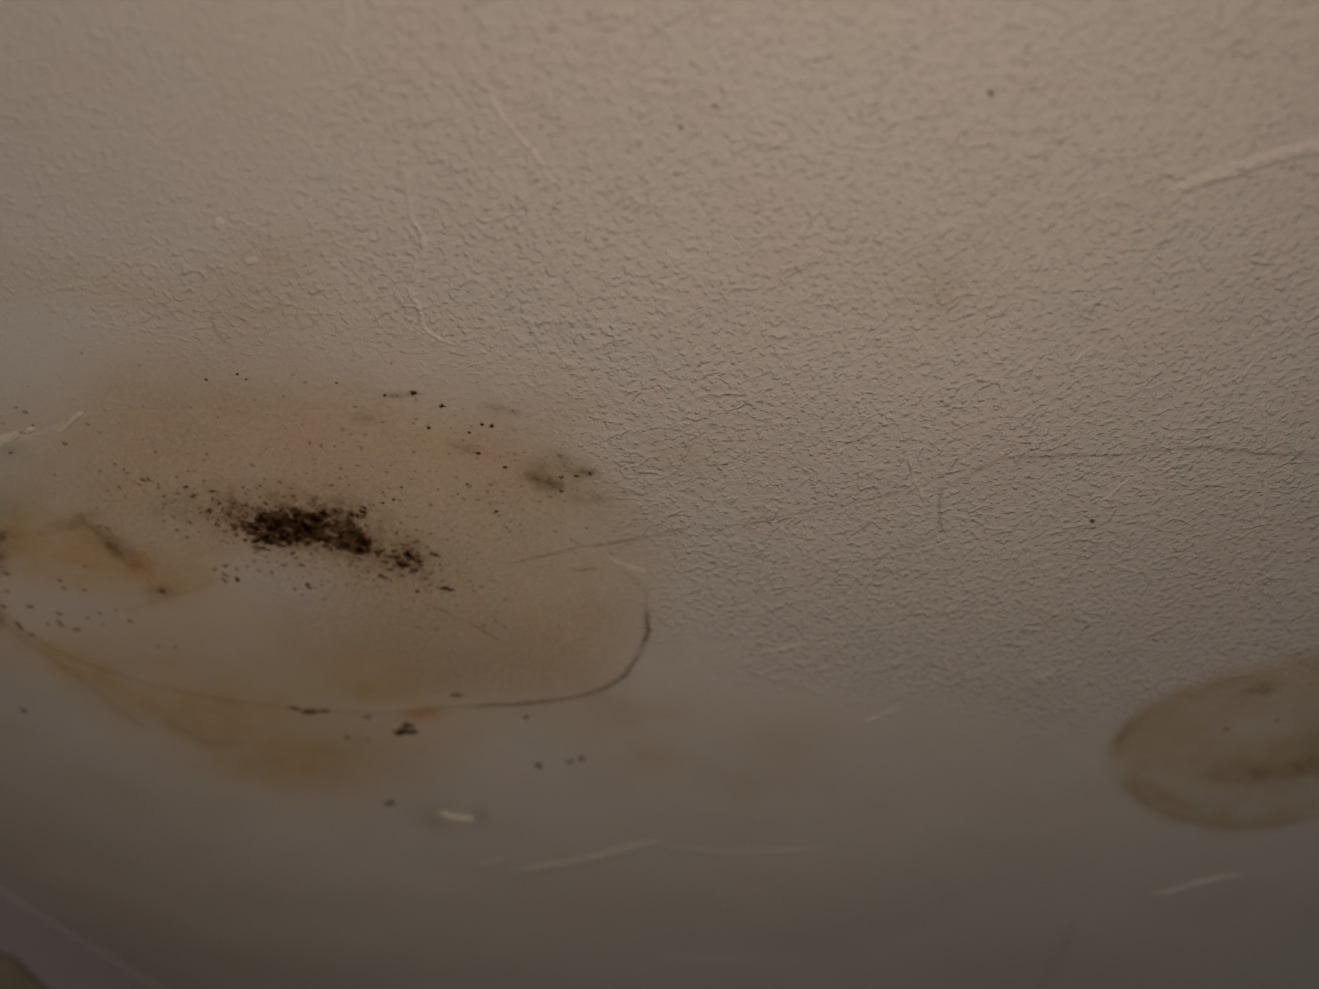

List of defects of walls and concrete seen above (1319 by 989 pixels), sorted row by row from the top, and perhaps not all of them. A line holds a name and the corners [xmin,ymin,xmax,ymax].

damp [235,507,370,554]